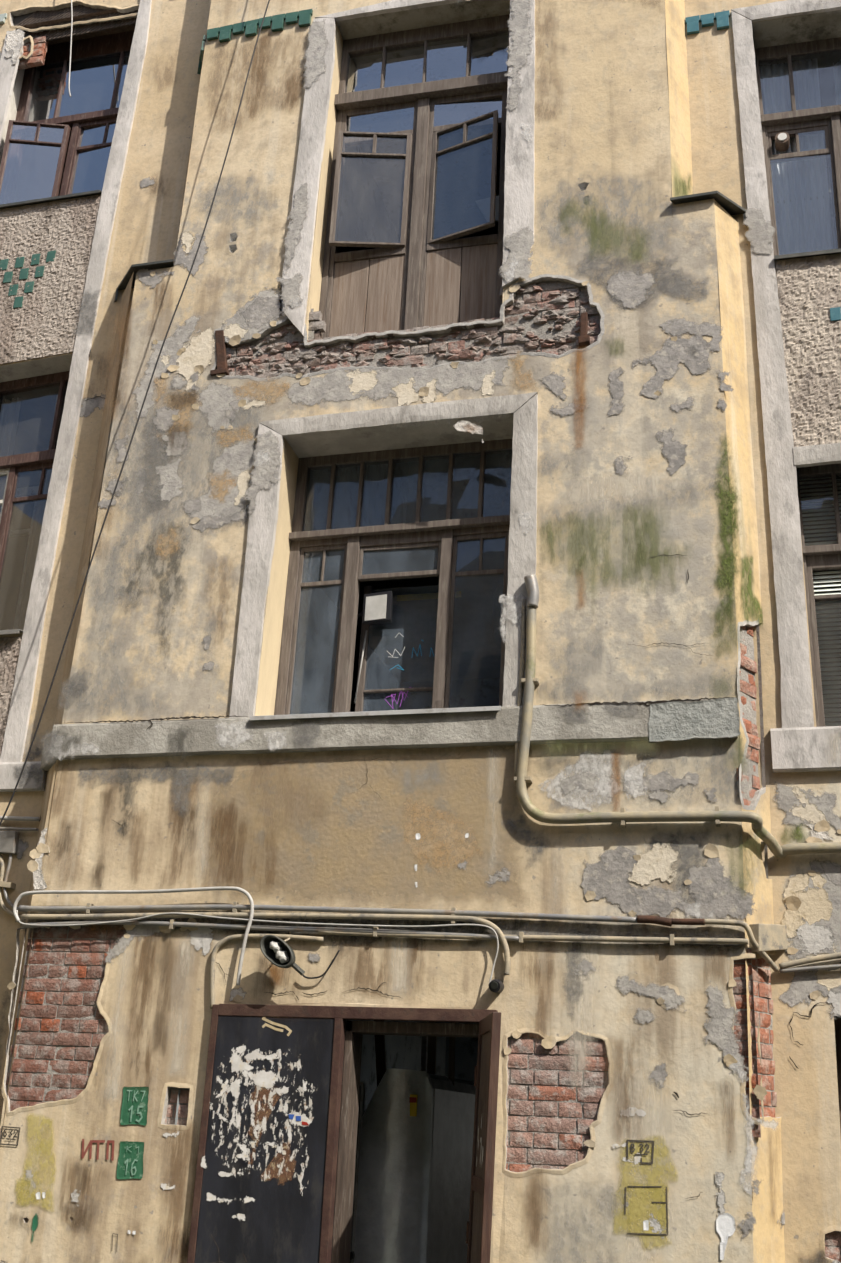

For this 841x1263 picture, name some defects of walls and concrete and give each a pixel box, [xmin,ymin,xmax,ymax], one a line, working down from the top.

peeling [505,0,533,111]
flaking render [98,226,605,533]
peeling [607,318,733,416]
leakage [716,605,734,647]
leakage [14,732,99,786]
leakage [79,731,234,833]
leakage [215,720,319,750]
flaking render [736,620,841,843]
flaking render [581,841,755,920]
flaking render [1,918,213,1116]
flaking render [704,860,841,1138]
flaking render [502,1028,614,1178]